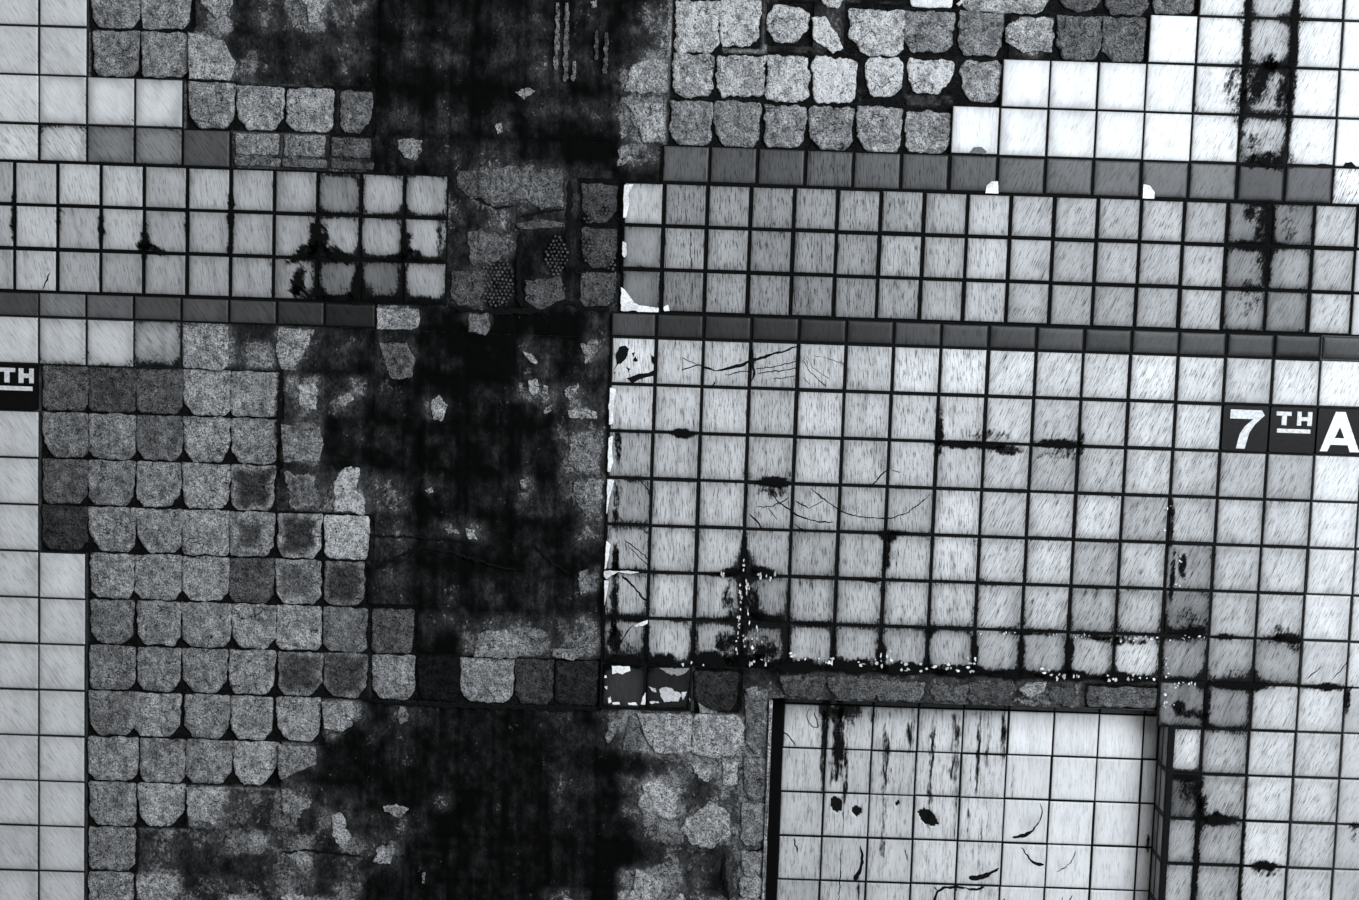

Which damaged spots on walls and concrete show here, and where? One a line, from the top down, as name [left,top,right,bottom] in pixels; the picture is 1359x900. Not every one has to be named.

spalling [89,0,423,172]
spalling [515,88,558,116]
spalling [497,0,612,88]
spalling [606,0,1199,172]
leakage [1224,0,1301,166]
spalling [41,100,1196,900]
leakage [195,0,1159,864]
crack [682,346,843,388]
leakage [1171,674,1276,730]
leakage [139,702,767,900]
leakage [1171,774,1219,900]
leakage [1237,792,1276,900]